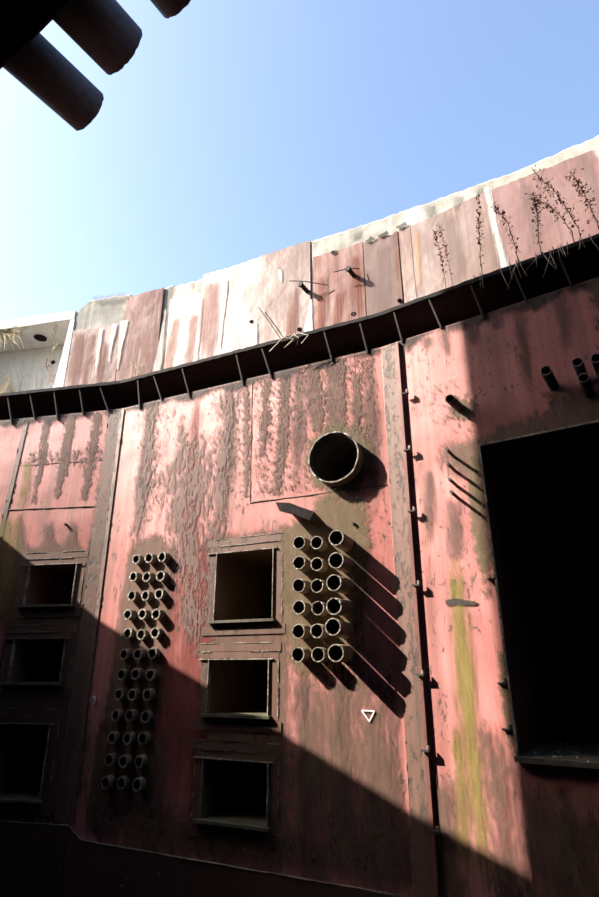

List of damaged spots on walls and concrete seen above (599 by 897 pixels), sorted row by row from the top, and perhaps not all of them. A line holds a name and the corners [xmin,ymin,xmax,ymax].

peeling [128,357,392,678]
damp [0,277,599,897]